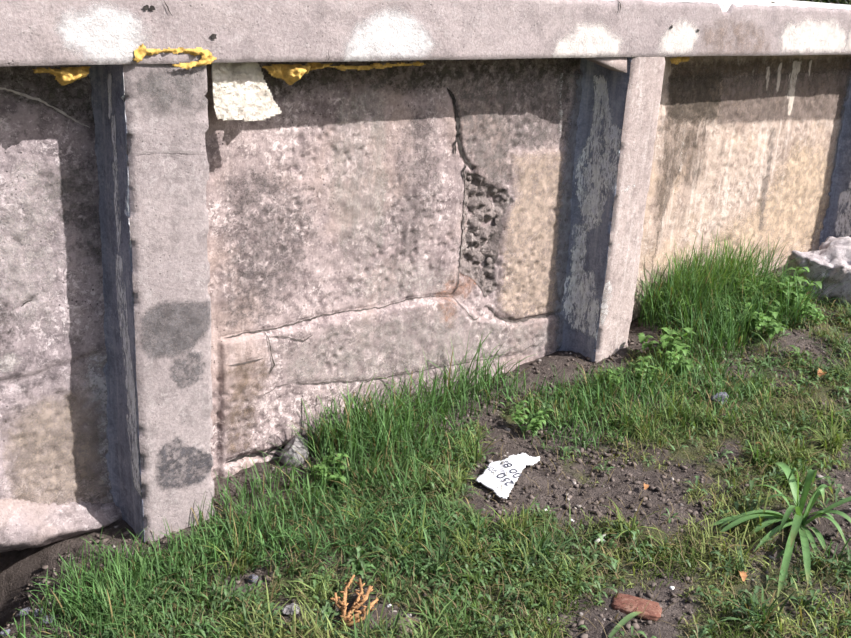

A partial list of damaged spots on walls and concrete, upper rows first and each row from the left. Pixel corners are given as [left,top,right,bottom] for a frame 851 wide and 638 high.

crack [447,88,471,184]
damp [655,19,851,252]
flaking render [459,154,564,315]
damp [562,74,635,339]
crack [225,273,555,400]
damp [157,439,213,489]
damp [229,363,267,450]